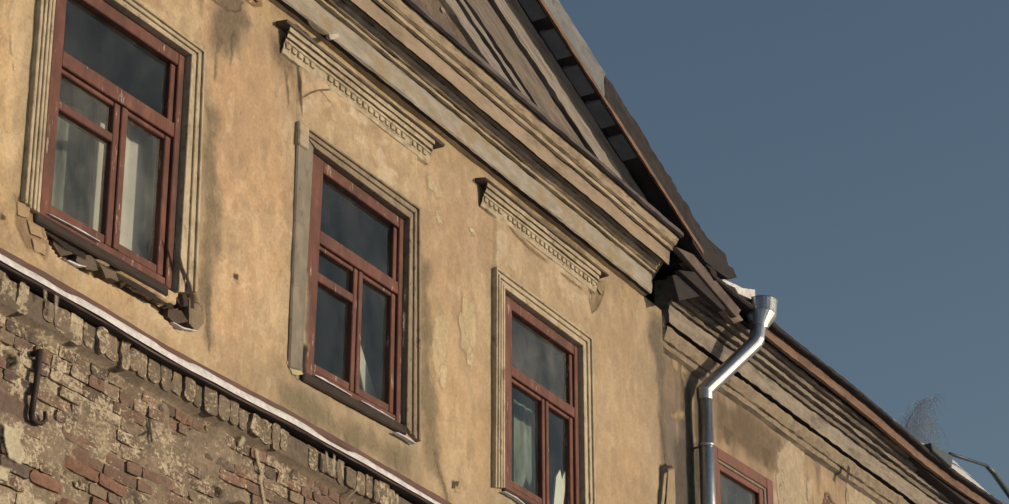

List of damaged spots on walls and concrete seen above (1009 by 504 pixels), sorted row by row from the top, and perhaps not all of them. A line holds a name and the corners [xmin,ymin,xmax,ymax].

flaking render [1,198,204,332]
flaking render [286,275,309,380]
damp [649,320,700,504]
crack [658,464,676,504]
peeling [776,440,834,504]
peeling [846,483,876,504]